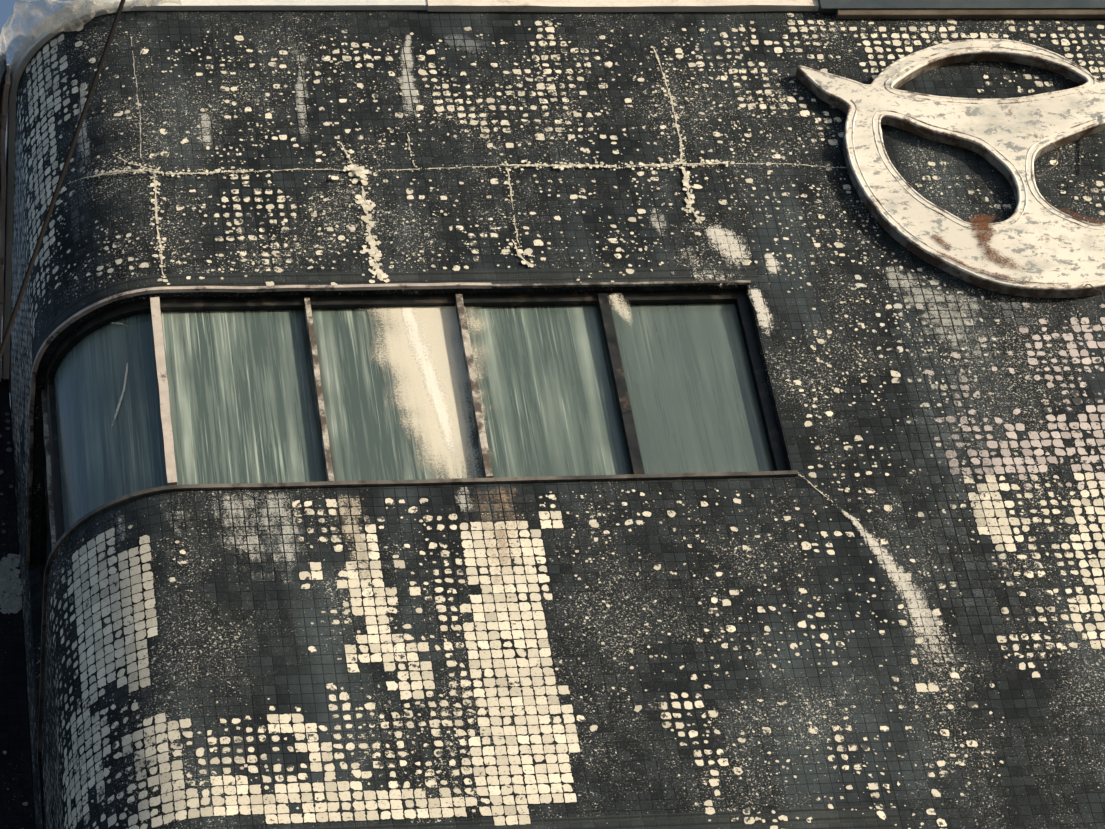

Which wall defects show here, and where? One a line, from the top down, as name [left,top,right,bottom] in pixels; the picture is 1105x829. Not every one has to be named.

peeling [0,25,157,650]
leakage [373,306,489,512]
peeling [27,485,1005,829]
leakage [842,509,963,675]